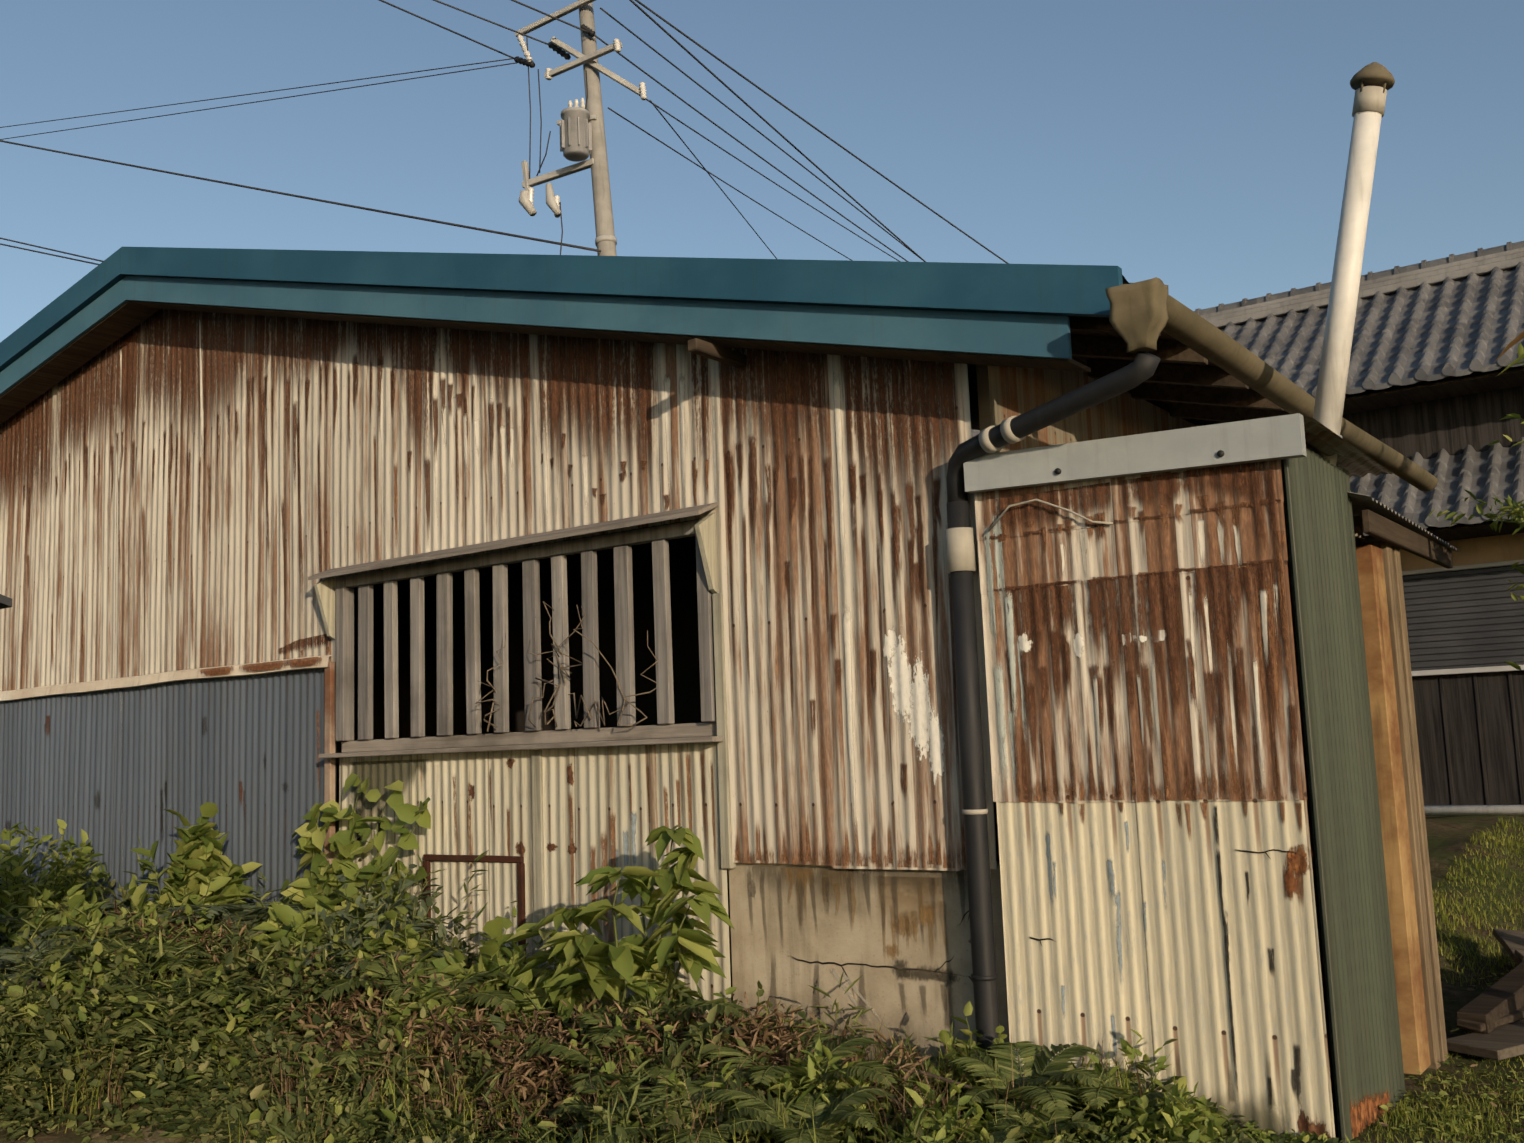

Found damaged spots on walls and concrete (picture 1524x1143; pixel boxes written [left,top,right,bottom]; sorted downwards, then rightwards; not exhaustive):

corrosion [0,309,657,593]
corrosion [200,634,331,676]
corrosion [691,347,959,794]
corrosion [985,461,1310,901]
corrosion [453,759,525,857]
corrosion [547,751,716,935]
corrosion [735,824,966,868]
damp [894,960,955,982]